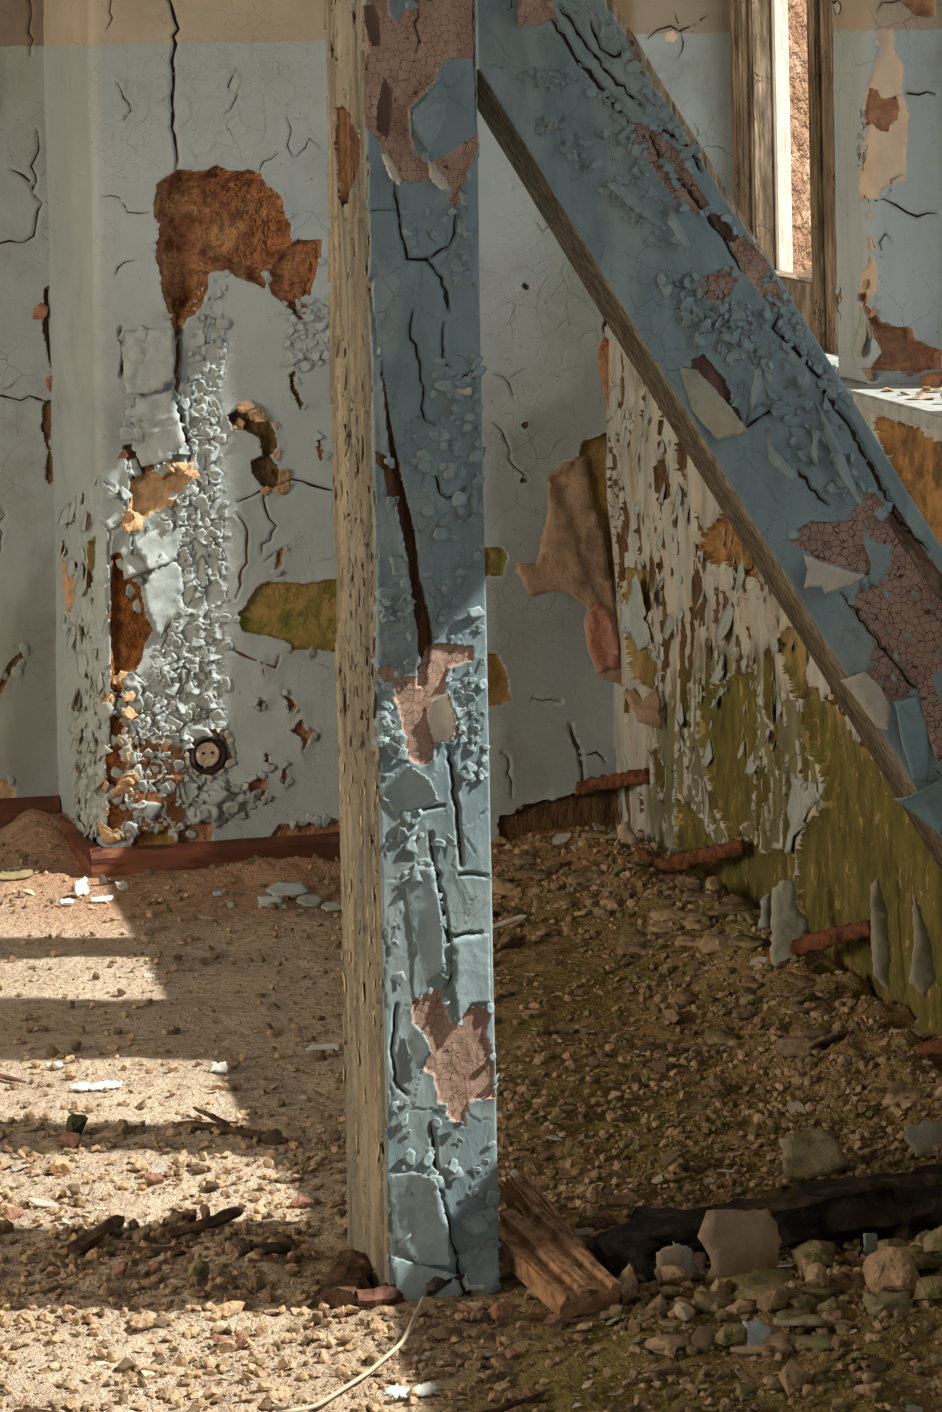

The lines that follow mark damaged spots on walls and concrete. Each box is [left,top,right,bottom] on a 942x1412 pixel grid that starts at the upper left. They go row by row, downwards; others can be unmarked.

crack [0,130,42,244]
crack [169,0,180,165]
peeling [358,0,480,288]
crack [551,7,742,272]
crack [0,394,51,404]
spalling [57,165,511,1026]
peeling [485,319,793,784]
crack [353,998,407,1094]
peeling [391,893,607,1269]
spalling [485,789,639,1002]
peeling [687,879,810,1021]
crack [430,1124,460,1274]